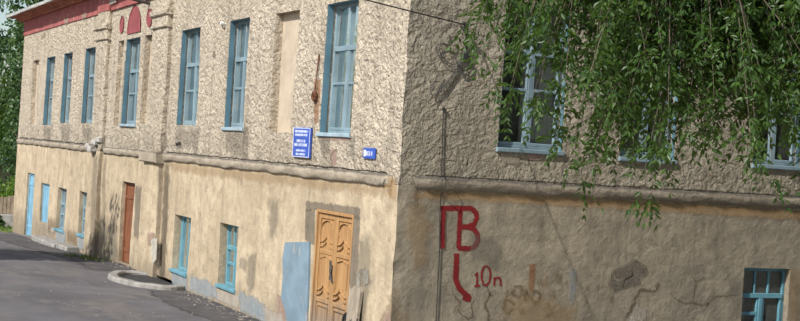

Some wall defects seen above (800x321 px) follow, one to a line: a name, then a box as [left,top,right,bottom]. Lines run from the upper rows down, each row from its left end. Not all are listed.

spalling [610,260,646,291]